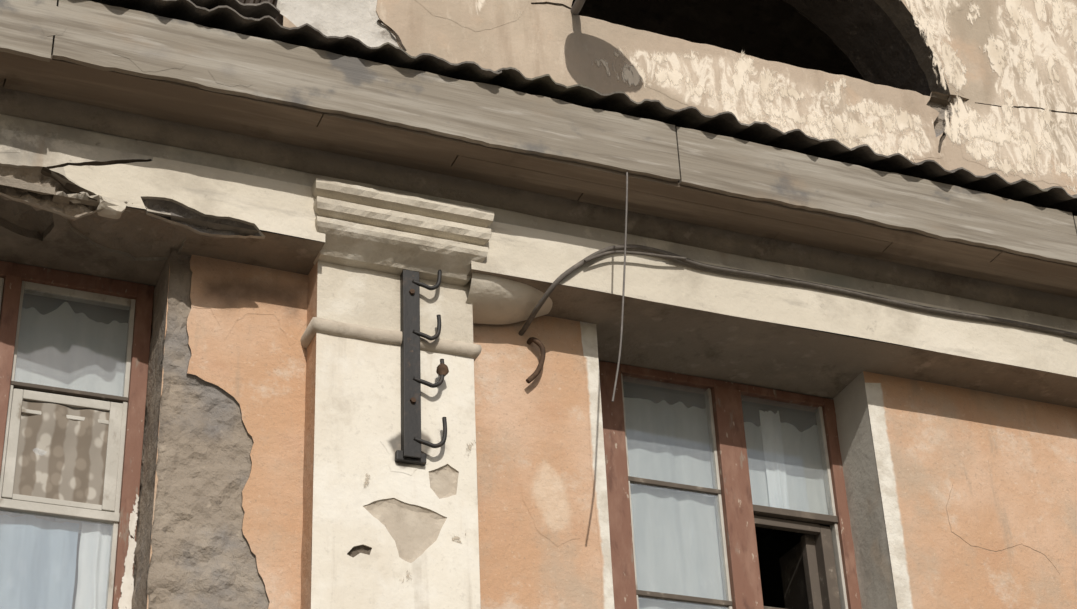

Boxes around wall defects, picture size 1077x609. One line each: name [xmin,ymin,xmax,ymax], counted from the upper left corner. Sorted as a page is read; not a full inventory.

peeling [276,0,401,48]
peeling [592,0,1077,192]
crack [975,102,1077,115]
spalling [0,163,270,609]
spalling [429,464,459,499]
spalling [347,544,372,557]
spalling [363,498,447,582]